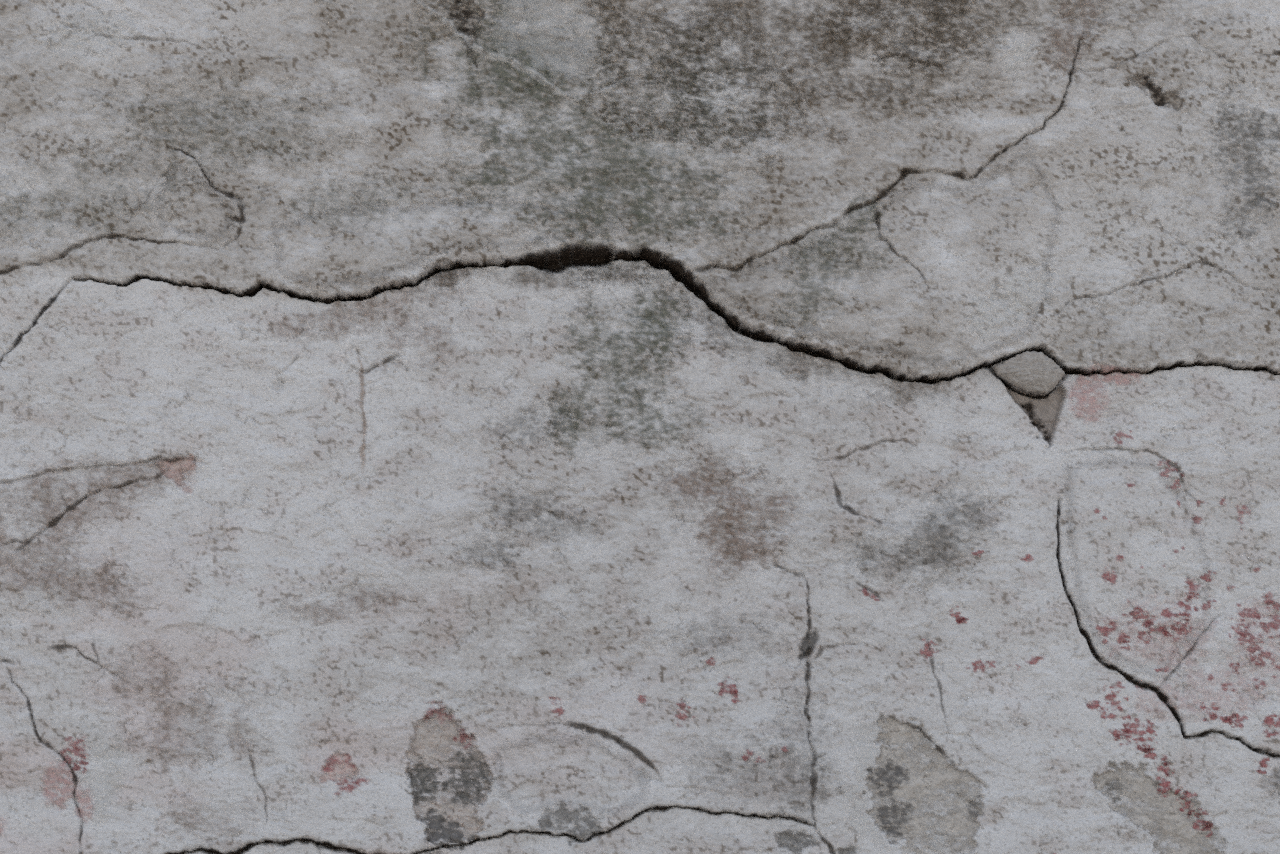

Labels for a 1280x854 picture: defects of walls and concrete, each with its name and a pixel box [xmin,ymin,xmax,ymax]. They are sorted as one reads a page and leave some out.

crack [175,149,245,222]
water stain [468,2,752,238]
crack [847,169,919,253]
crack [952,46,1079,179]
water stain [1246,114,1280,205]
crack [14,245,1280,399]
flaking render [1005,386,1064,442]
crack [804,586,812,721]
crack [1057,505,1280,757]
crack [575,724,653,768]
crack [167,839,365,854]
crack [414,806,835,854]